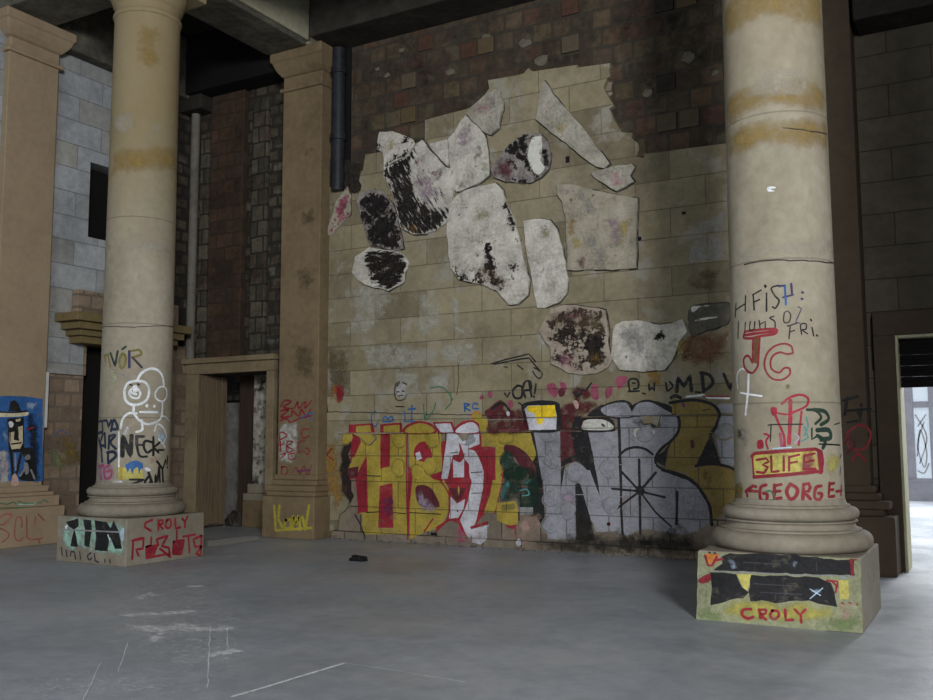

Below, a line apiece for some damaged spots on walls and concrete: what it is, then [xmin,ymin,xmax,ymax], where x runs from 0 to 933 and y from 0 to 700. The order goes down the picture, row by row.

peeling [328,80,688,375]